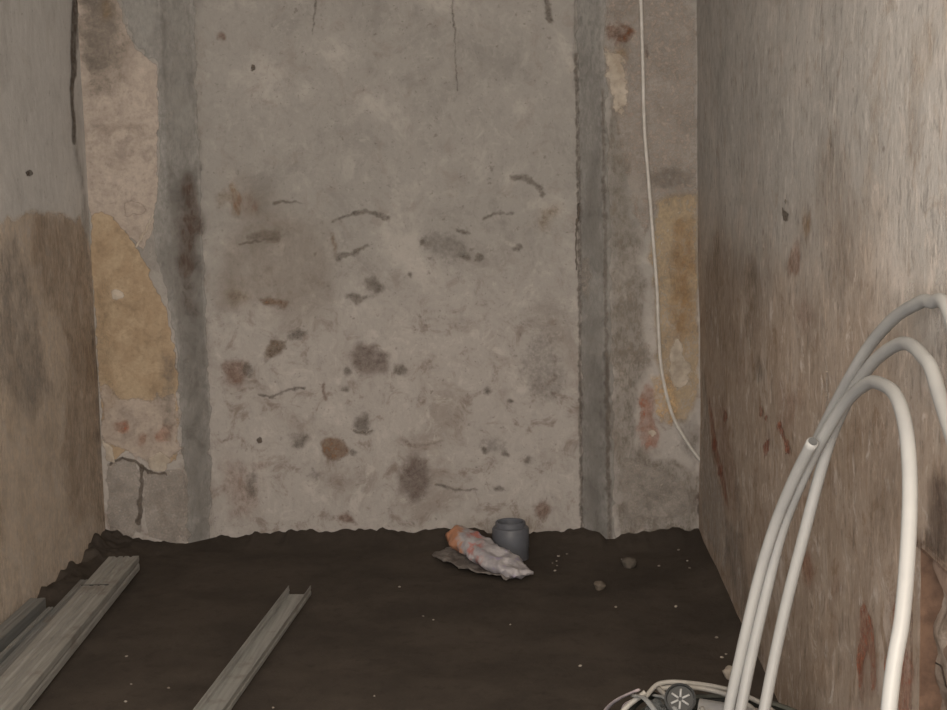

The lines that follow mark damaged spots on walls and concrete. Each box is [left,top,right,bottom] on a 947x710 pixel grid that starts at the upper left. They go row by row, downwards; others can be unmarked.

damp [0,213,106,624]
spalling [77,0,182,472]